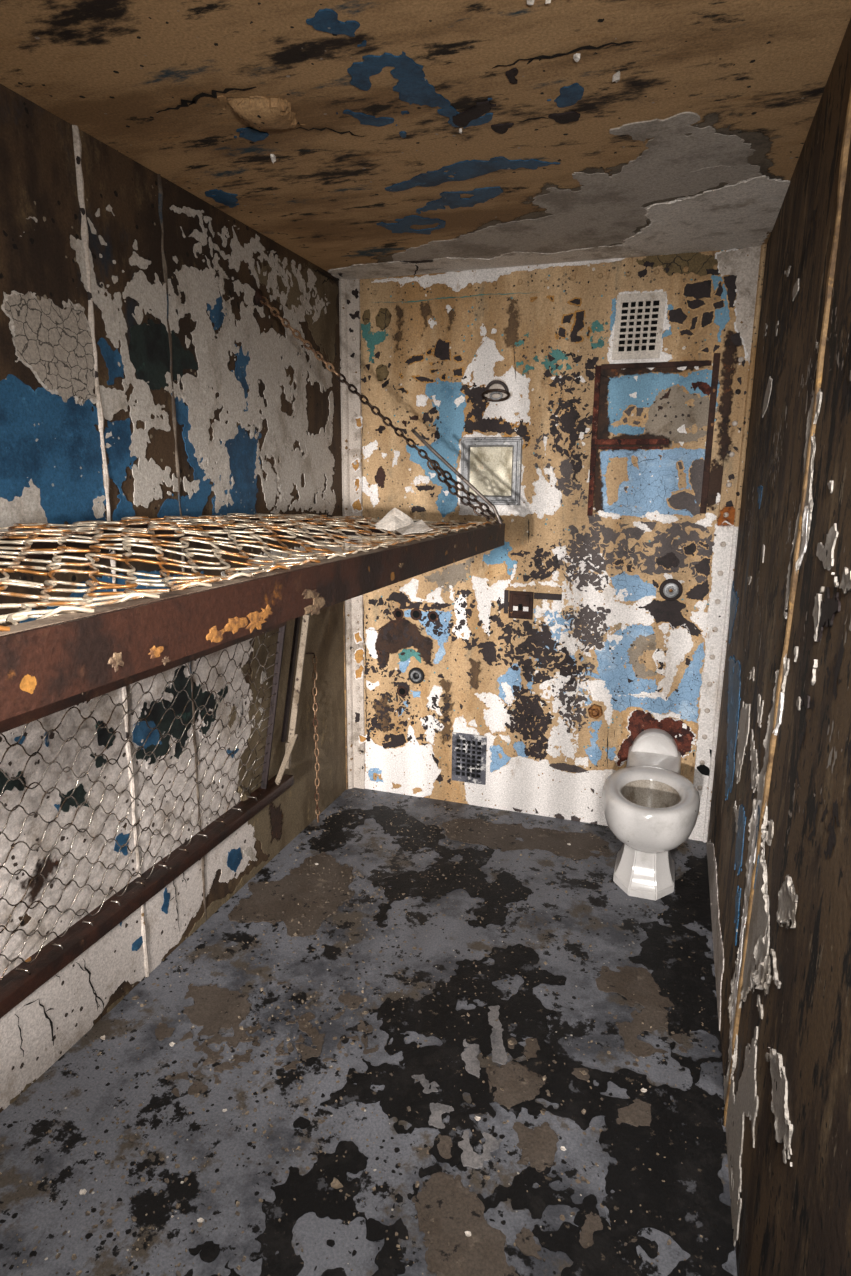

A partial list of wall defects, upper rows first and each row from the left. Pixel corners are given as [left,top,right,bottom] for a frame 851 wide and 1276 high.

peeling [306,8,514,138]
peeling [547,83,584,124]
peeling [0,112,790,531]
corrosion [593,360,703,513]
peeling [779,276,851,619]
peeling [20,570,204,623]
peeling [221,539,342,576]
spalling [804,523,851,700]
spalling [320,207,820,1276]
peeling [0,602,614,1110]
spalling [184,1241,240,1276]
spalling [250,1141,413,1276]